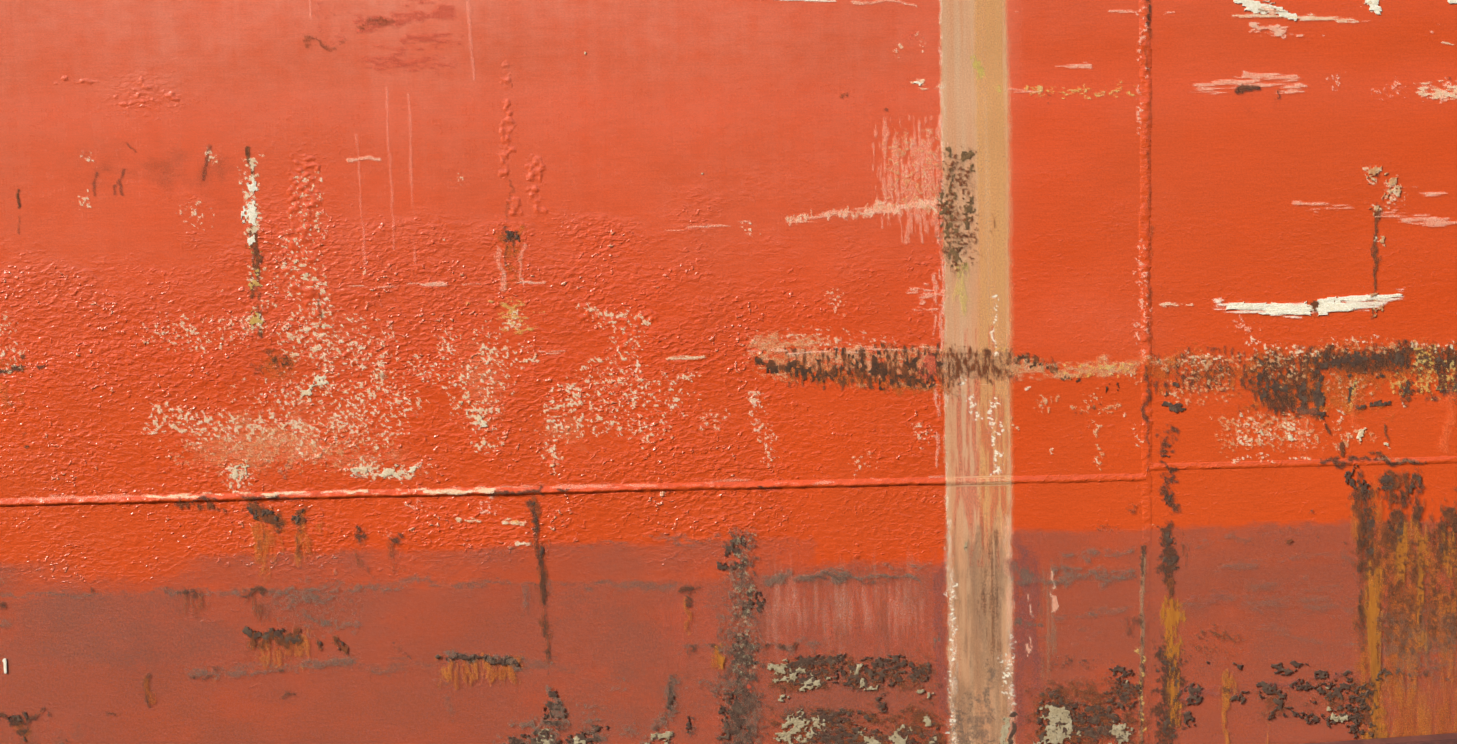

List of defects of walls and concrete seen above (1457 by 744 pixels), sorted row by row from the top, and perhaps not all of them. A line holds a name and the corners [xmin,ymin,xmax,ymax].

peeling [1233,0,1346,38]
peeling [1365,0,1382,15]
rust [935,147,995,308]
peeling [1226,294,1402,316]
rust [1363,166,1454,318]
rust [749,334,1457,455]
rust [242,495,321,562]
rust [238,586,348,668]
rust [488,486,568,663]
rust [497,586,731,744]
rust [754,569,949,744]
rust [1191,455,1457,744]